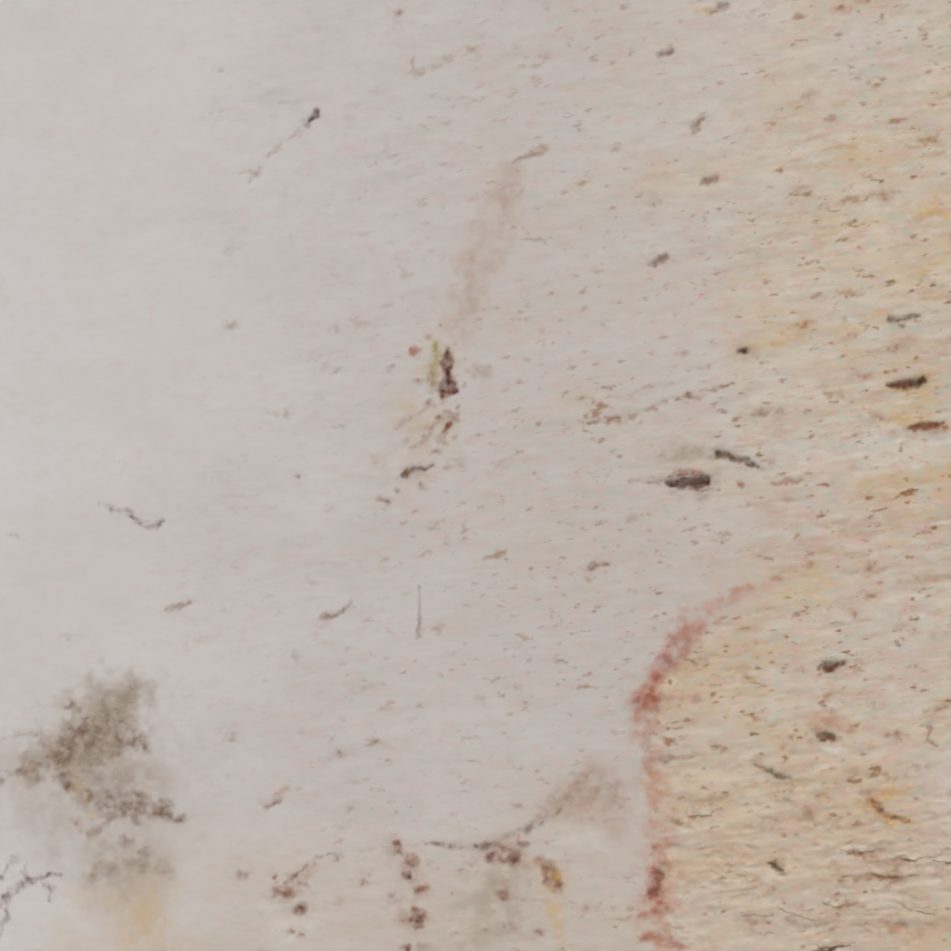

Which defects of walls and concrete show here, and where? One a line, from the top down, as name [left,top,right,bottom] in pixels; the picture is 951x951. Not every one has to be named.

damp [20,686,133,789]